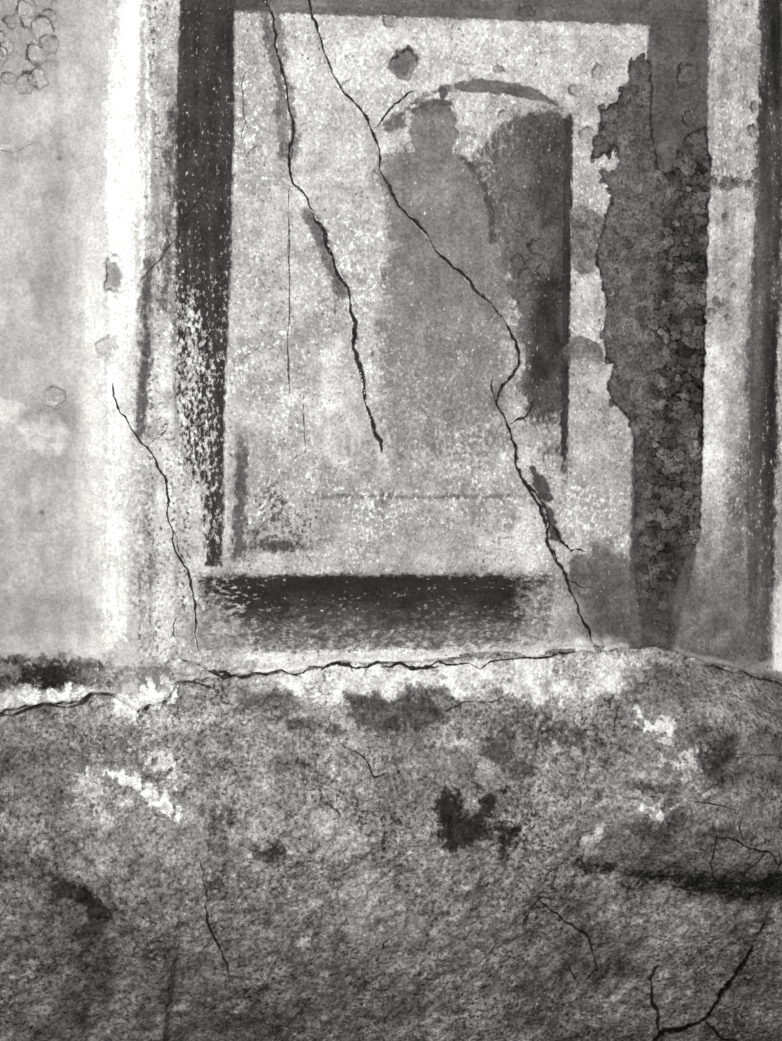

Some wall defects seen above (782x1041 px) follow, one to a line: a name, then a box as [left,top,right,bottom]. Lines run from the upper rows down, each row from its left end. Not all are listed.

flaking render [0,0,59,94]
crack [112,0,593,712]
peeling [562,53,759,628]
damp [771,581,782,672]
crack [0,692,115,715]
crack [705,665,781,686]
damp [0,649,782,901]
damp [51,876,112,921]
damp [338,863,426,948]
crack [648,918,766,1041]